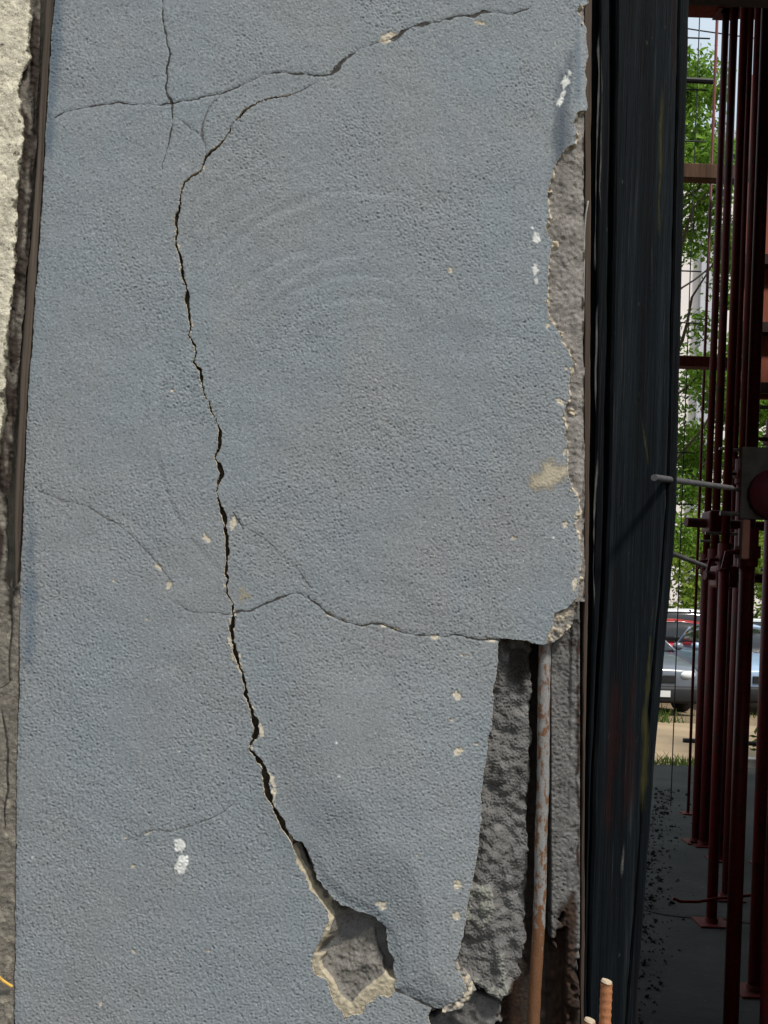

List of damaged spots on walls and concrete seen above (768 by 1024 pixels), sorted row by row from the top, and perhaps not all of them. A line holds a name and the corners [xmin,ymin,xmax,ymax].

crack [38,0,529,848]
spalling [544,111,585,602]
spalling [289,833,397,1020]
spalling [428,619,580,1024]